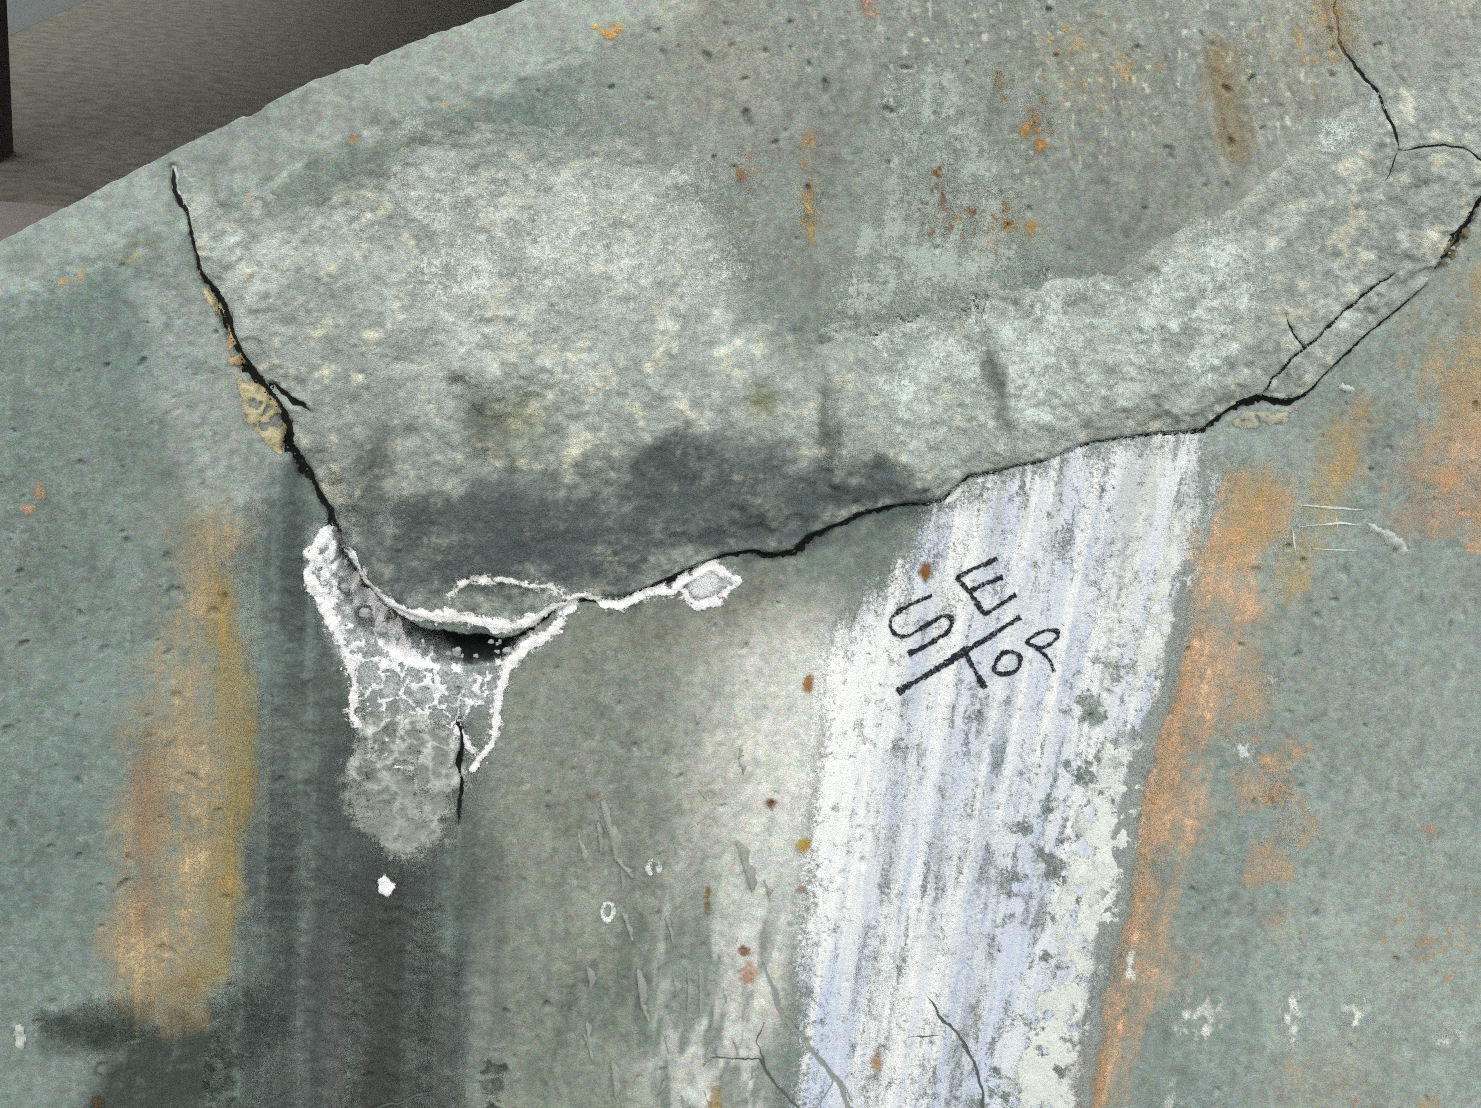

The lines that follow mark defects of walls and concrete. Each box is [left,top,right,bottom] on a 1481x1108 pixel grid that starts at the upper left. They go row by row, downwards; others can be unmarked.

damp [1261,90,1389,199]
crack [1333,0,1481,181]
crack [171,168,343,541]
crack [516,197,1481,637]
corrosion [175,521,240,699]
damp [47,52,1282,1108]
corrosion [1201,494,1268,624]
corrosion [106,650,252,1021]
crack [456,692,464,823]
corrosion [1151,626,1236,849]
crack [909,996,984,1108]
corrosion [1092,905,1164,1108]